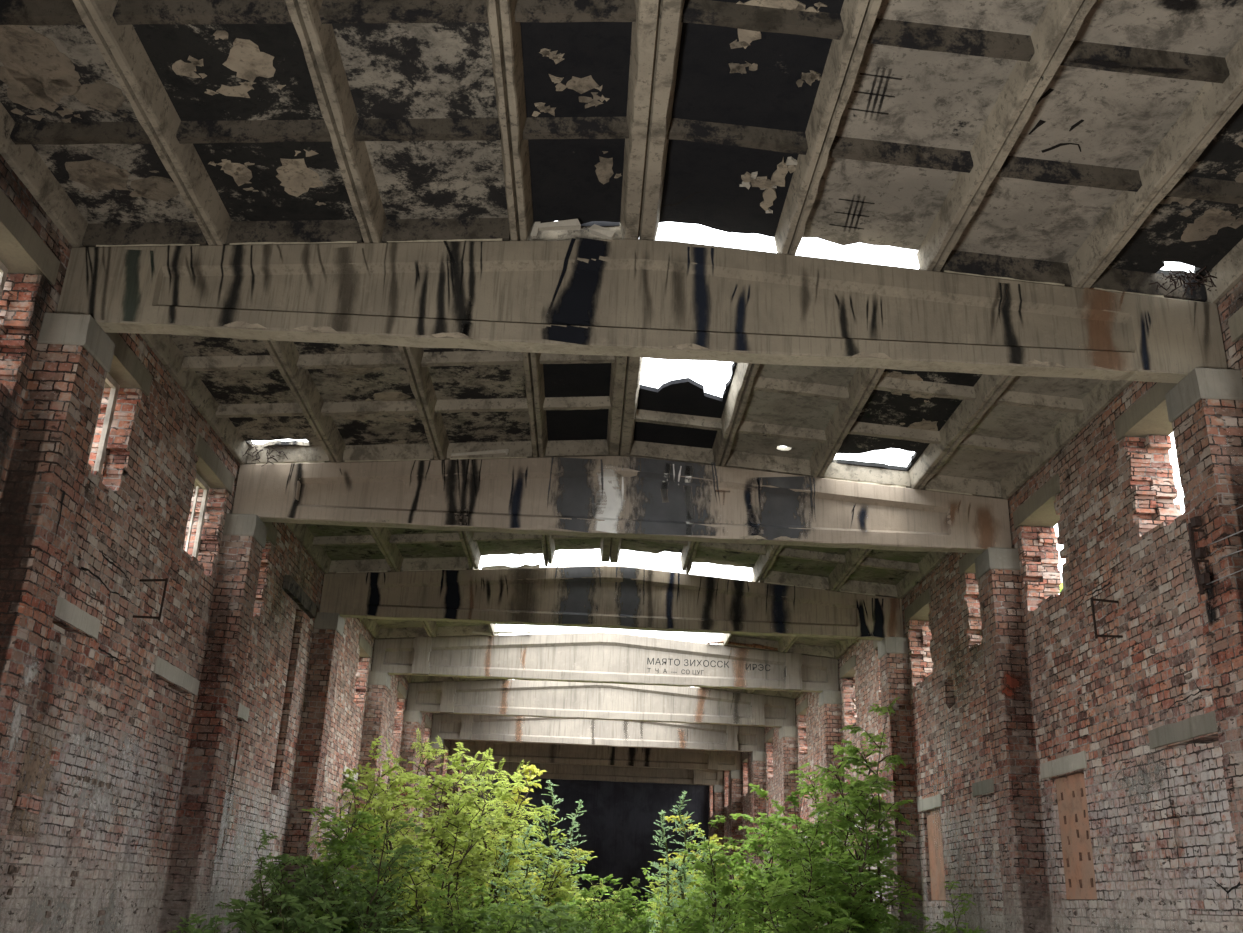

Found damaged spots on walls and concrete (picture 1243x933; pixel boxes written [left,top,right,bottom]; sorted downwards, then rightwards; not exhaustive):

peeling [736,0,827,13]
peeling [172,30,286,98]
peeling [728,29,761,74]
peeling [276,150,326,206]
peeling [739,157,797,214]
peeling [1158,197,1243,242]
water stain [415,241,482,336]
water stain [543,238,608,345]
water stain [666,247,714,348]
water stain [408,459,482,526]
water stain [547,457,724,536]
water stain [554,566,680,628]